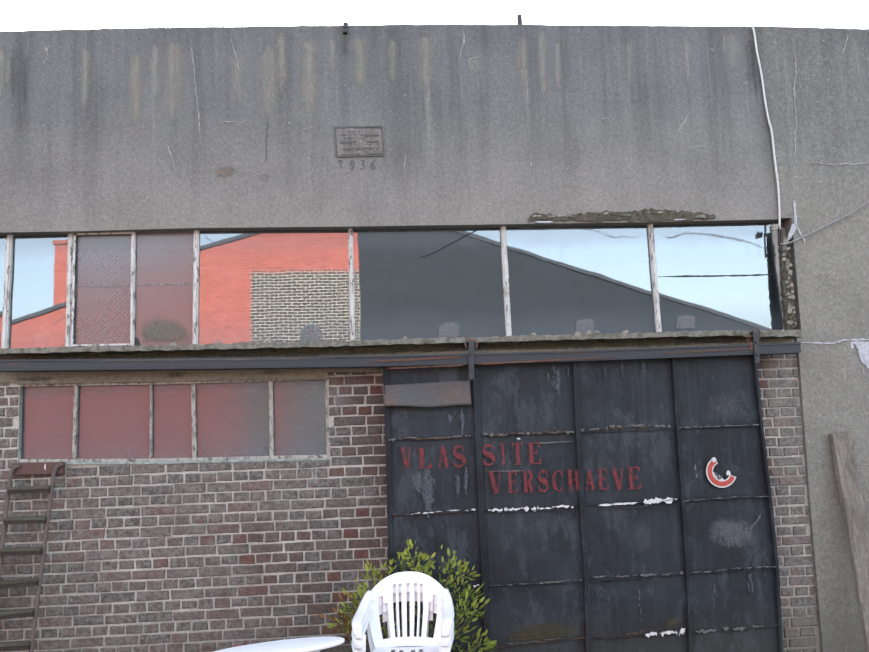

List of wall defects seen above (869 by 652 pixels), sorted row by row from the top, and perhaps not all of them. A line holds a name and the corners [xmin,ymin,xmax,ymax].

crack [190,39,201,141]
crack [785,51,865,167]
spalling [528,208,716,223]
peeling [770,200,805,328]
peeling [488,505,573,513]
peeling [497,625,763,648]